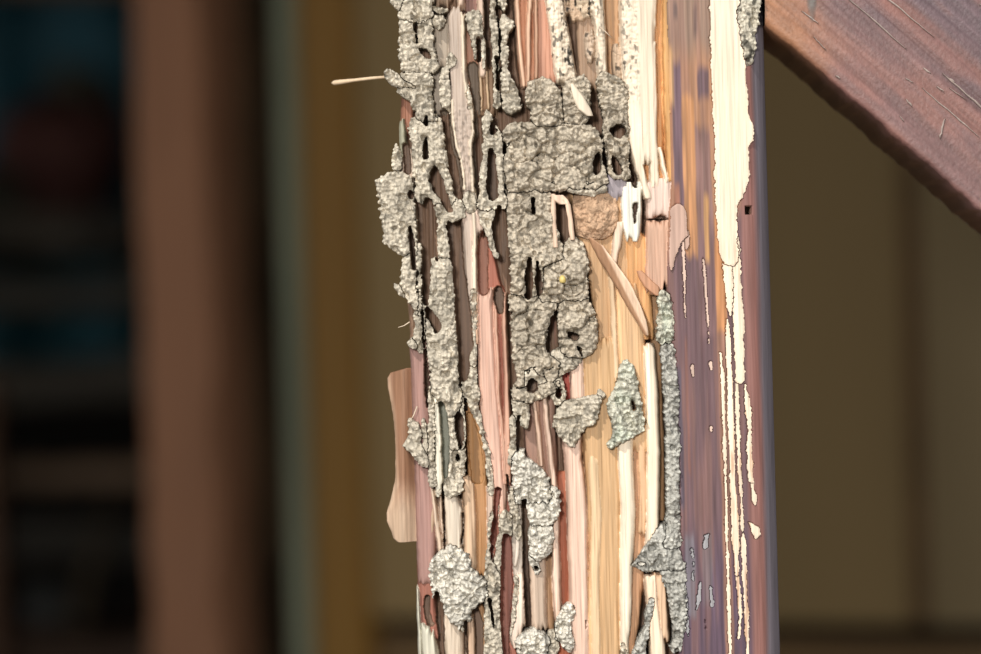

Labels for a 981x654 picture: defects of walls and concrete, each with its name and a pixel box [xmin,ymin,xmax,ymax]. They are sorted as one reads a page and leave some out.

peeling [668,204,690,270]
peeling [708,0,761,654]